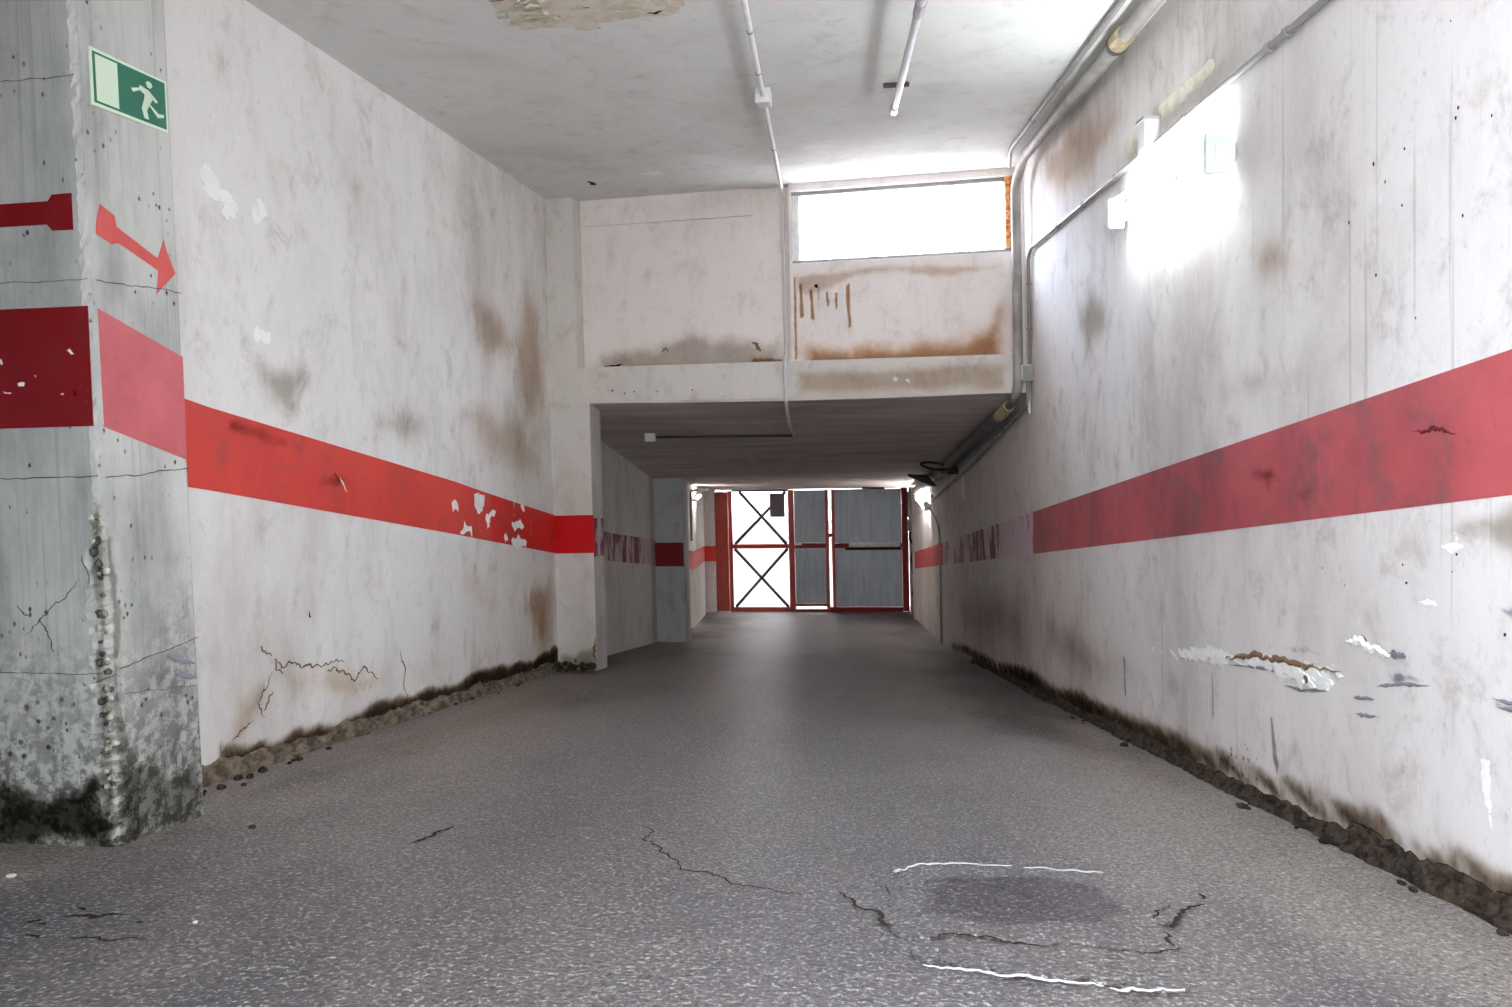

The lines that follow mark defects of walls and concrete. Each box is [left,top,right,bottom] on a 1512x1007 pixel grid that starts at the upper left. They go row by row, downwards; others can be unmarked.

peeling [490,0,684,31]
peeling [452,493,527,549]
crack [17,555,90,652]
leakage [349,646,558,722]
flaking render [1152,639,1344,692]
leakage [221,725,332,758]
leakage [953,645,1394,841]
flaking render [970,657,1512,936]
leakage [1480,758,1493,830]
crack [641,825,802,894]
leakage [1427,856,1512,895]